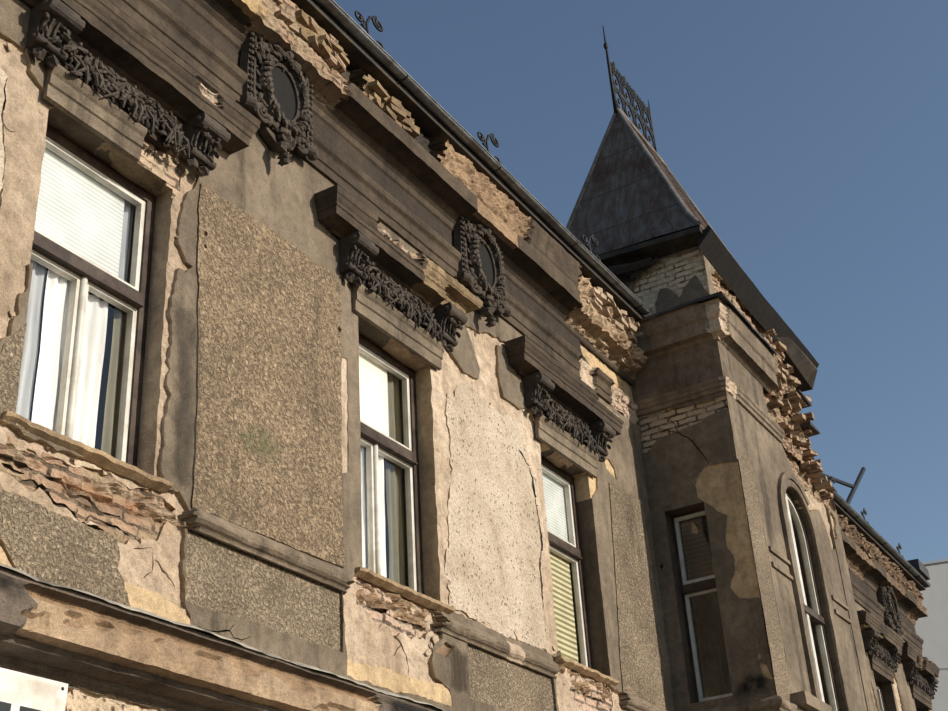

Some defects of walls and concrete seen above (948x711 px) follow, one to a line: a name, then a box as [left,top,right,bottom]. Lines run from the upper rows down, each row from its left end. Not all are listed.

flaking render [232,0,346,74]
crack [0,78,15,207]
flaking render [0,32,55,341]
flaking render [0,420,191,625]
flaking render [94,139,200,478]
peeling [341,357,349,473]
flaking render [343,325,632,711]
crack [518,449,546,631]
crack [661,420,709,464]
flaking render [579,248,837,551]
flaking render [695,461,760,599]
flaking render [65,687,174,711]